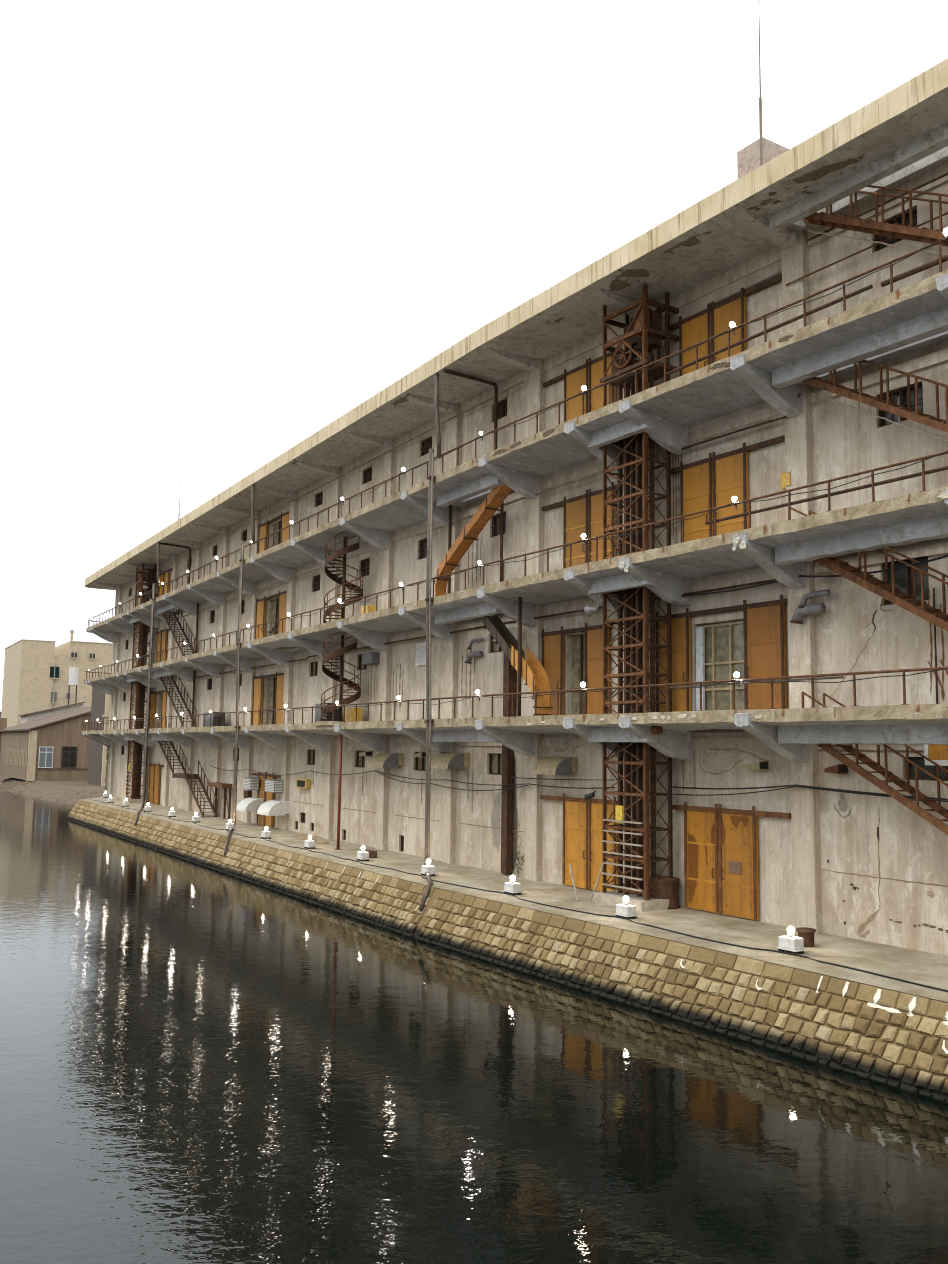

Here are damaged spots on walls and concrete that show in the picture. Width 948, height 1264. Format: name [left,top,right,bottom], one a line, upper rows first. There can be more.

spalling [794,156,864,194]
spalling [747,191,780,211]
corrosion [927,622,948,700]